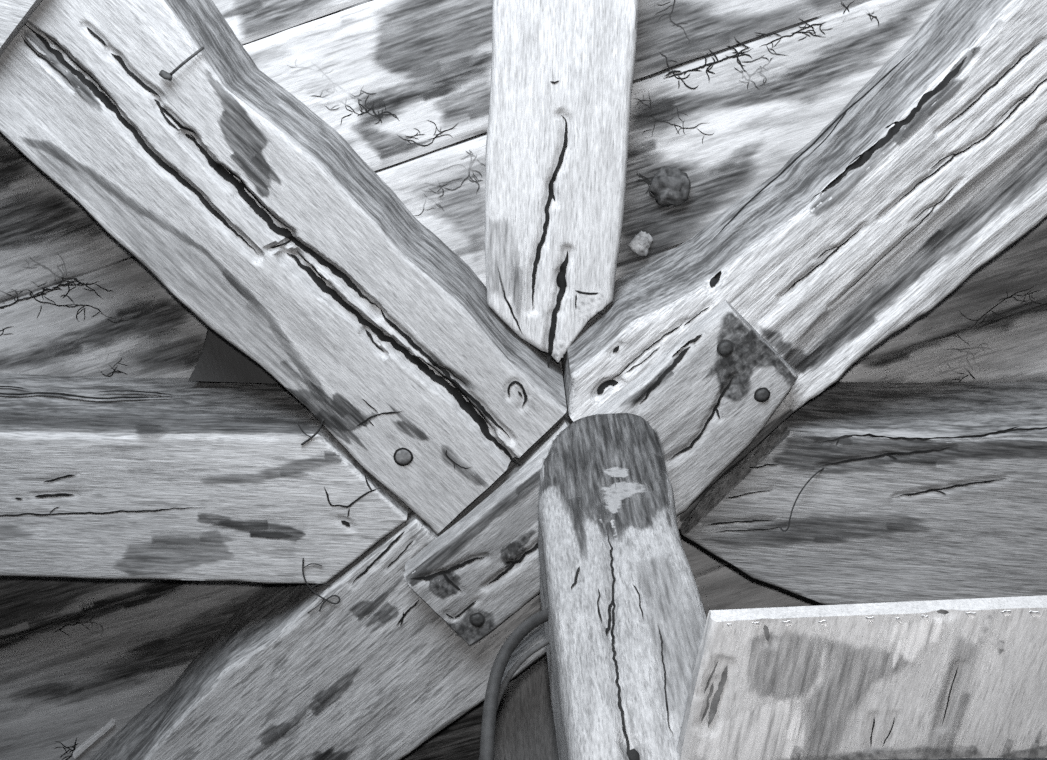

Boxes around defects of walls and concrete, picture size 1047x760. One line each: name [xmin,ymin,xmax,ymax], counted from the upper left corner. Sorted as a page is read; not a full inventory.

crack [0,24,521,466]
crack [498,115,606,368]
crack [707,51,913,245]
crack [811,56,967,200]
crack [780,78,1047,305]
crack [940,42,1041,131]
water stain [350,365,792,630]
crack [571,533,673,760]
water stain [648,561,684,687]